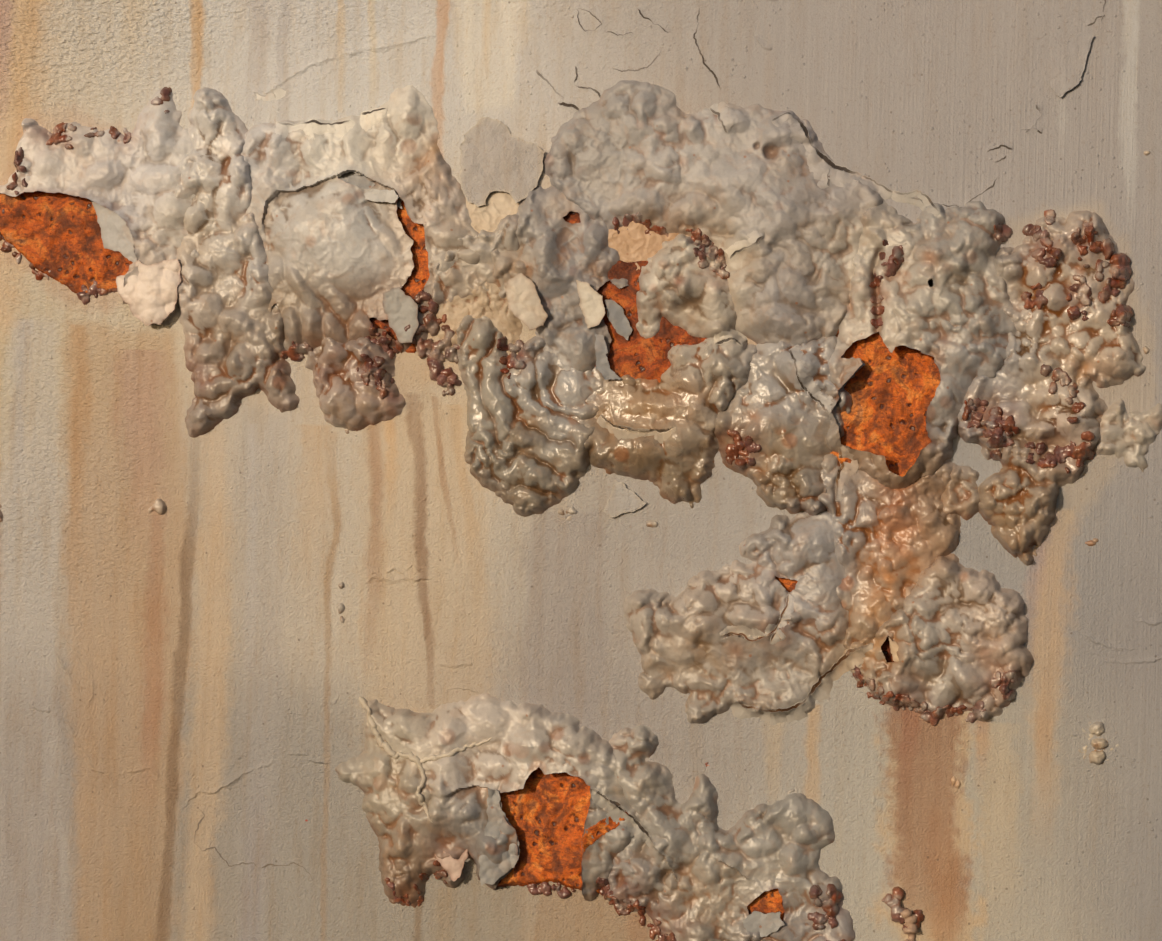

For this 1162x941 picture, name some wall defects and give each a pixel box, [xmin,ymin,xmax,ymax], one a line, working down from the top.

corrosion [0,0,133,194]
corrosion [186,0,207,127]
peeling [460,117,546,207]
crack [528,2,734,134]
peeling [1042,35,1094,98]
corrosion [998,192,1162,413]
corrosion [0,235,239,941]
corrosion [859,454,1128,941]